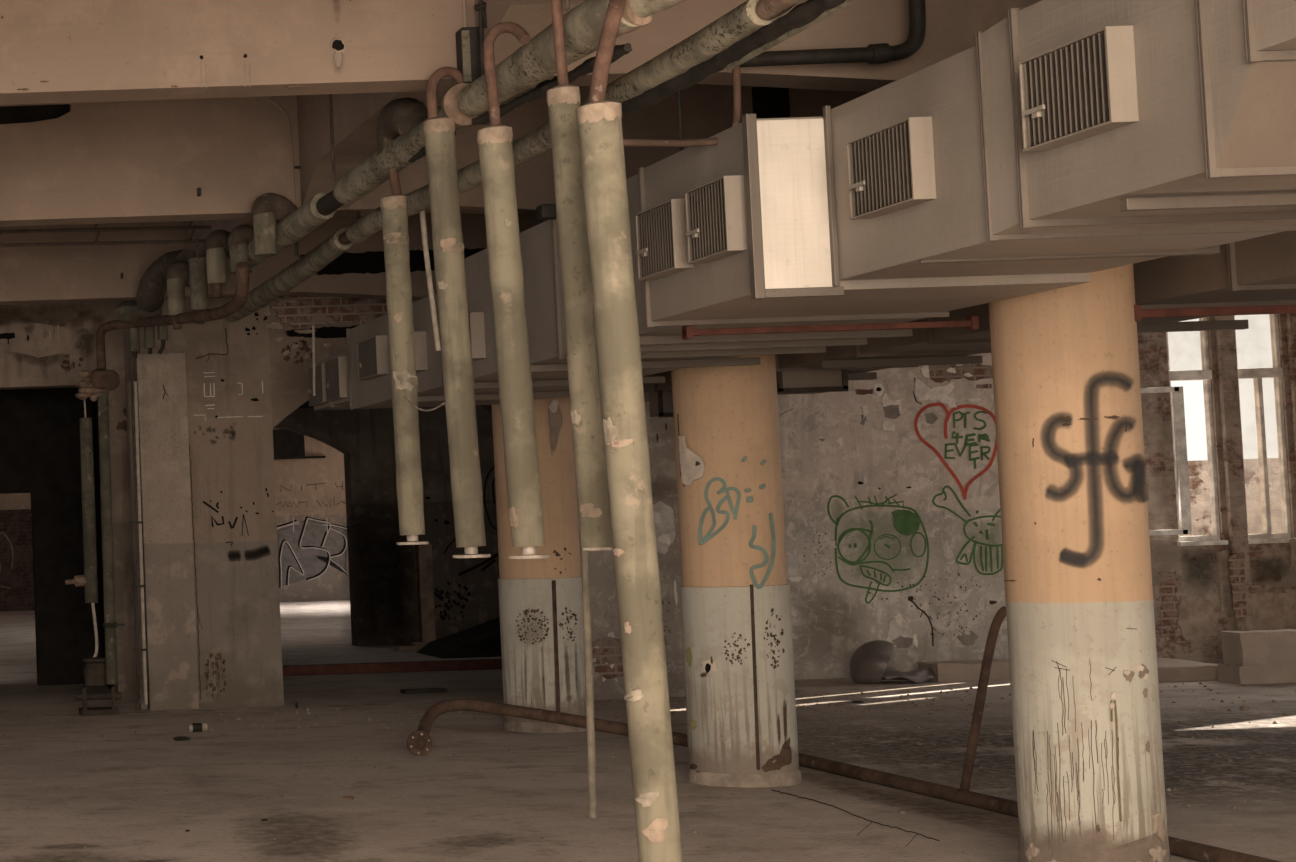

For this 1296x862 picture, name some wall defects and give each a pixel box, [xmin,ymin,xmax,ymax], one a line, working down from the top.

spalling [276,321,361,364]
peeling [677,414,705,487]
flaking render [1158,550,1296,641]
flaking render [1025,812,1168,862]